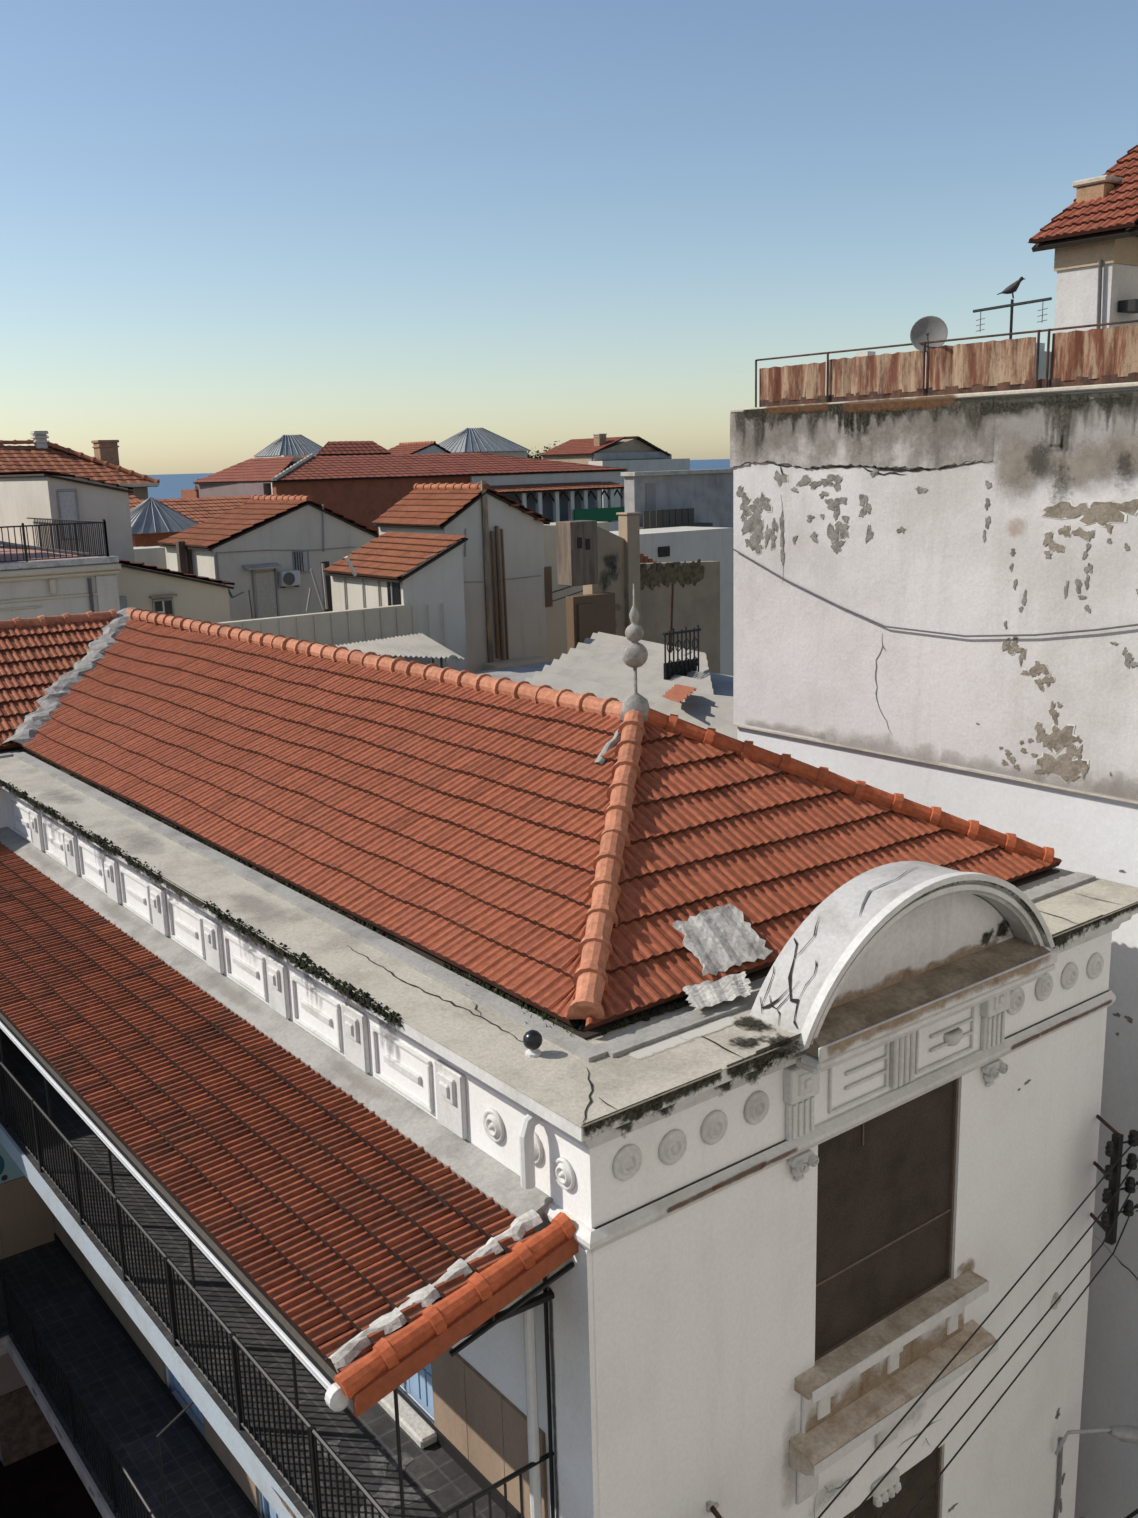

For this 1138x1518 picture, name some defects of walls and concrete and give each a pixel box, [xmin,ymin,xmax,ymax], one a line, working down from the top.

leakage [735,390,1138,503]
peeling [736,469,873,566]
peeling [982,480,992,542]
peeling [1041,498,1138,614]
peeling [999,548,1089,784]
peeling [1110,642,1138,670]
crack [859,866,965,916]
crack [760,917,819,1028]
leakage [582,1016,803,1136]
leakage [806,1317,964,1432]